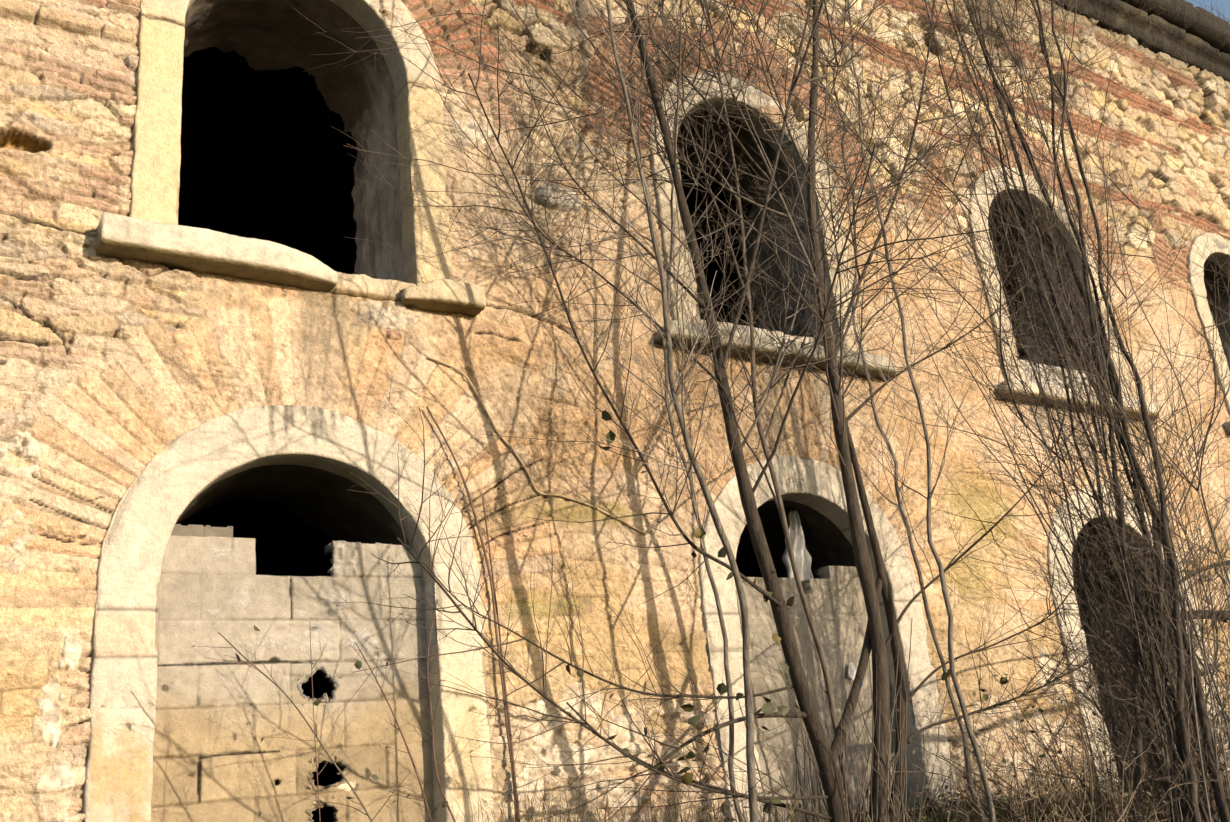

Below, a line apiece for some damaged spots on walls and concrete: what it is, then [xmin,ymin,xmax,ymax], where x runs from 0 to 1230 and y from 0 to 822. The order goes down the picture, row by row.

spalling [0,127,46,153]
spalling [296,661,343,706]
spalling [305,755,358,822]